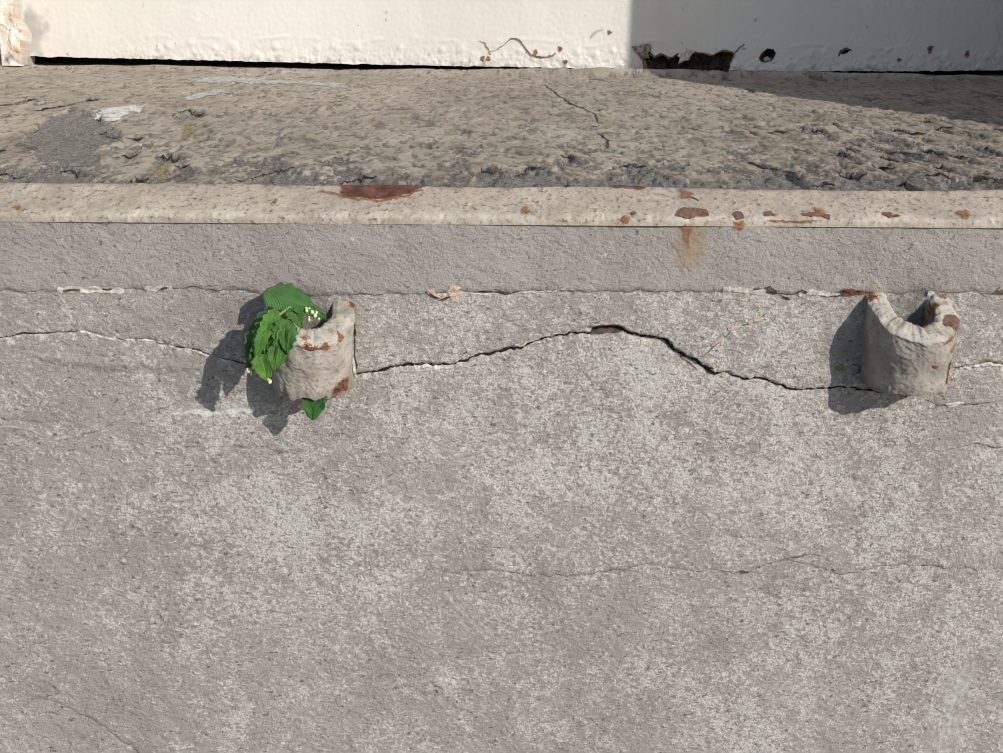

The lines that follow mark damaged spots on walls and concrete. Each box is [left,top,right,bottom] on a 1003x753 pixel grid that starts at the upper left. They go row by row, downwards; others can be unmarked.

spalling [632,44,733,72]
crack [545,85,610,148]
spalling [0,98,159,184]
spalling [473,120,1003,191]
spalling [234,166,326,186]
rust [320,184,423,202]
rust [676,189,709,244]
rust [764,207,831,223]
crack [307,288,733,296]
rust [943,314,960,332]
crack [0,329,246,365]
crack [353,293,881,393]